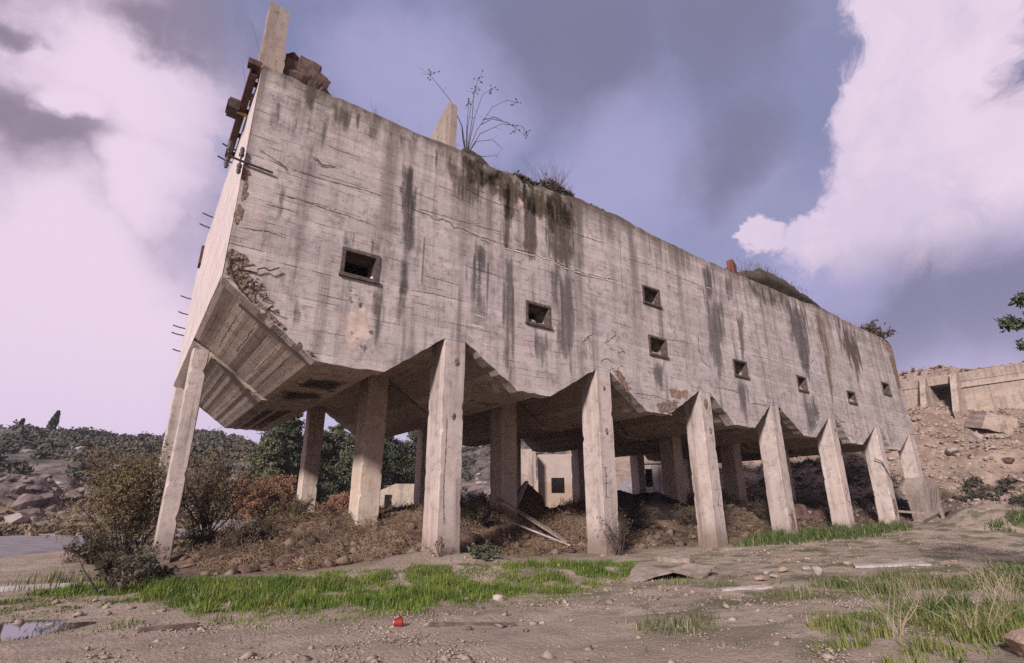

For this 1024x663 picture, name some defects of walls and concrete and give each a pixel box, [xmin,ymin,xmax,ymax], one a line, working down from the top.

damp [399,169,416,311]
crack [415,189,713,289]
spalling [226,248,286,331]
damp [786,299,809,377]
damp [838,320,862,373]